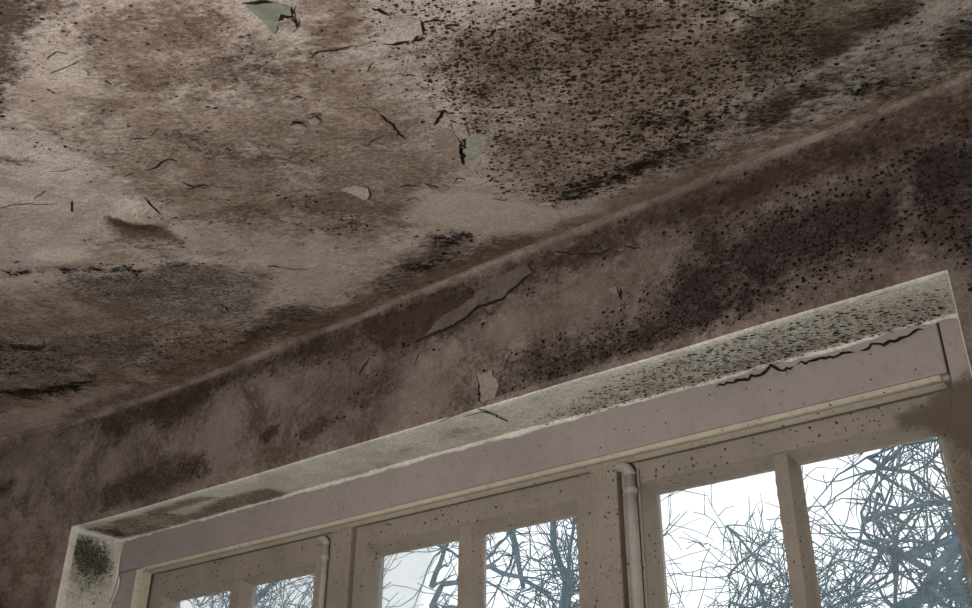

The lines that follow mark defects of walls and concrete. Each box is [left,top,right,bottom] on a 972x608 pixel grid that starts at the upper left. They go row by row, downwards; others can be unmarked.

peeling [244,0,298,34]
peeling [433,110,489,165]
water stain [0,0,972,449]
peeling [414,264,532,343]
peeling [461,369,499,406]
water stain [67,449,282,605]